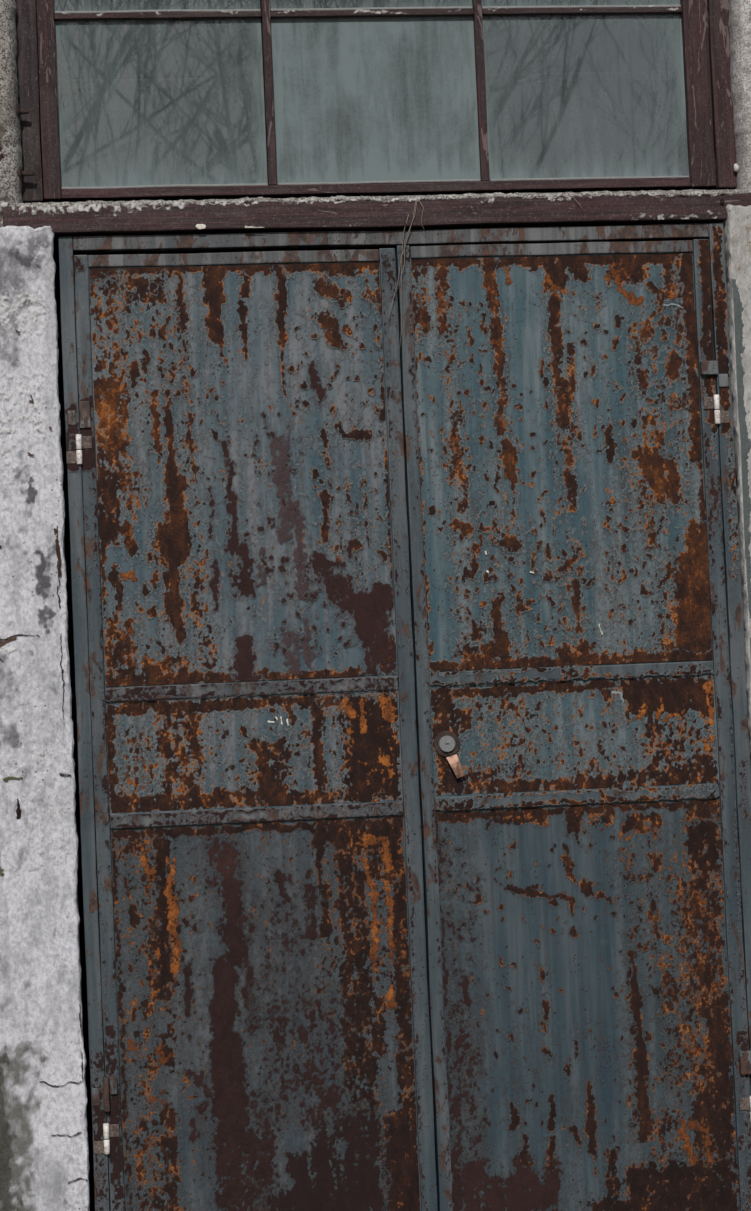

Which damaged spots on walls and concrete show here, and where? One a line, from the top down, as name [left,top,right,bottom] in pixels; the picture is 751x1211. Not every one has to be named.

damp [0,1045,39,1211]
corrosion [65,226,751,1211]